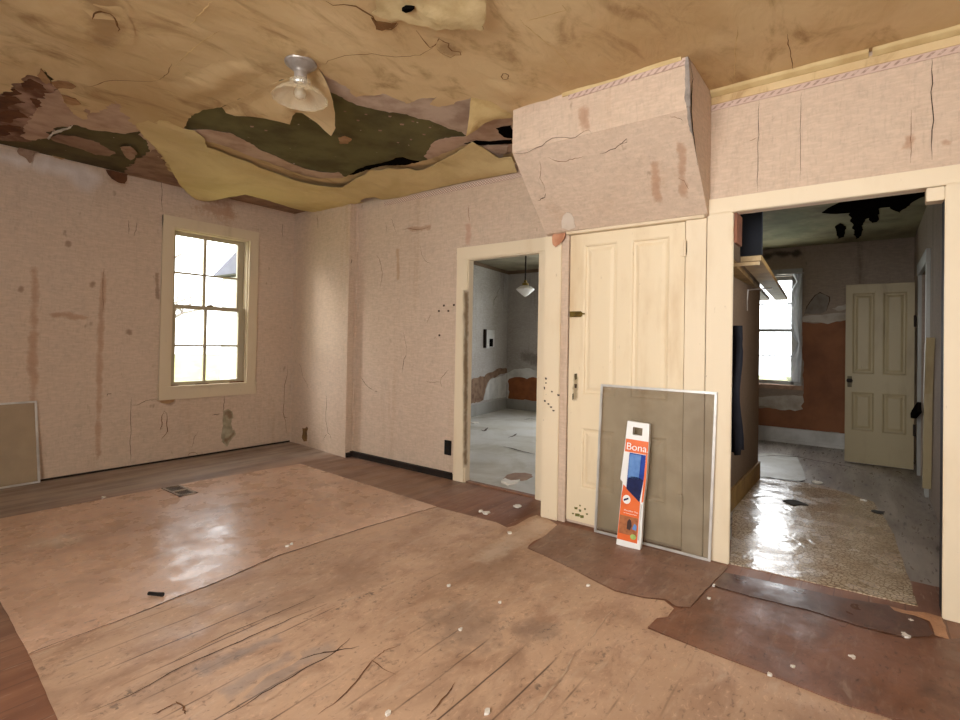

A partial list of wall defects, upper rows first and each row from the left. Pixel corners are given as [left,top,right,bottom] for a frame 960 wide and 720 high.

crack [899,62,934,163]
spalling [0,146,107,199]
crack [515,130,587,201]
spalling [835,223,846,239]
flaking render [484,368,580,411]
spalling [221,409,236,446]